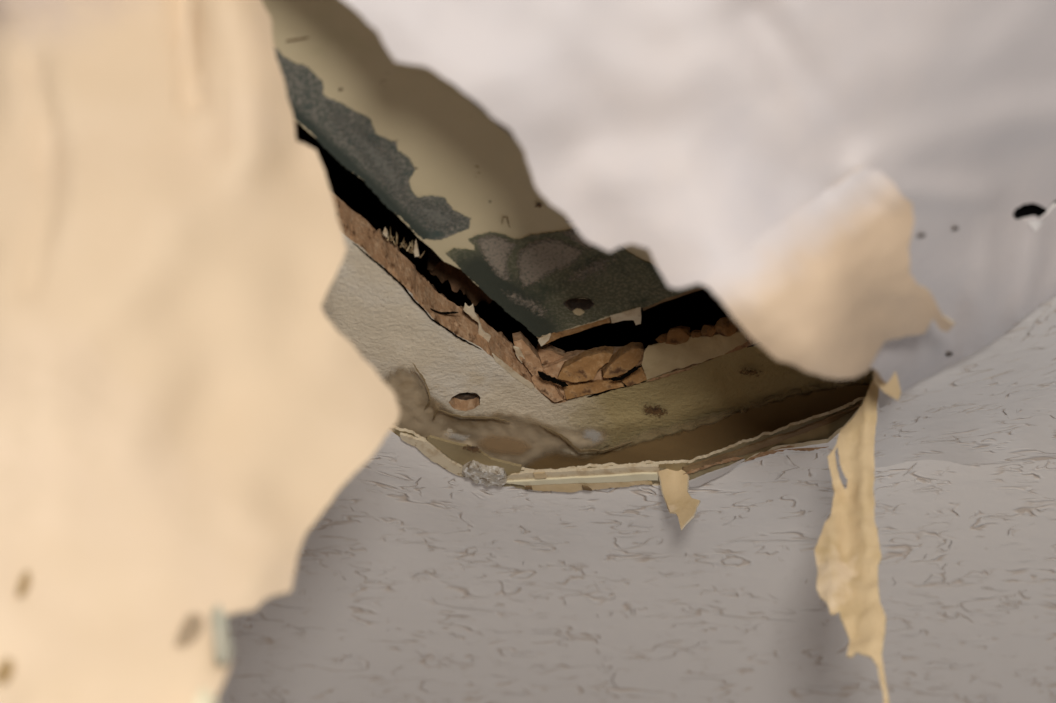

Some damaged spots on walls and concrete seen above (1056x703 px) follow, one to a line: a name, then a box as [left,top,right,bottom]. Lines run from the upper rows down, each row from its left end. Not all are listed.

peeling [342,0,1056,703]